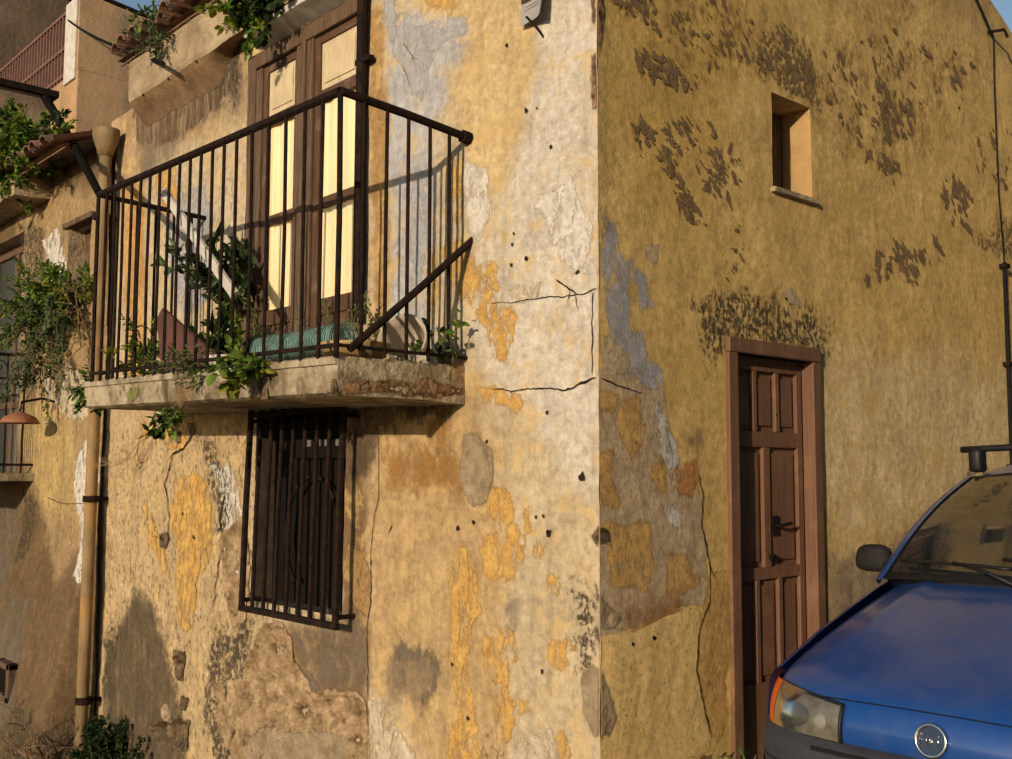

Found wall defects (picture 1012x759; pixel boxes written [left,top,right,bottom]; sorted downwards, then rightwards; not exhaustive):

peeling [409,158,540,363]
crack [491,280,643,393]
peeling [630,113,742,226]
peeling [590,0,976,186]
peeling [864,233,945,288]
peeling [940,172,974,239]
peeling [143,462,250,631]
spalling [448,433,545,759]
peeling [534,177,731,759]
crack [696,472,715,737]
spalling [215,621,368,759]
peeling [482,628,571,759]